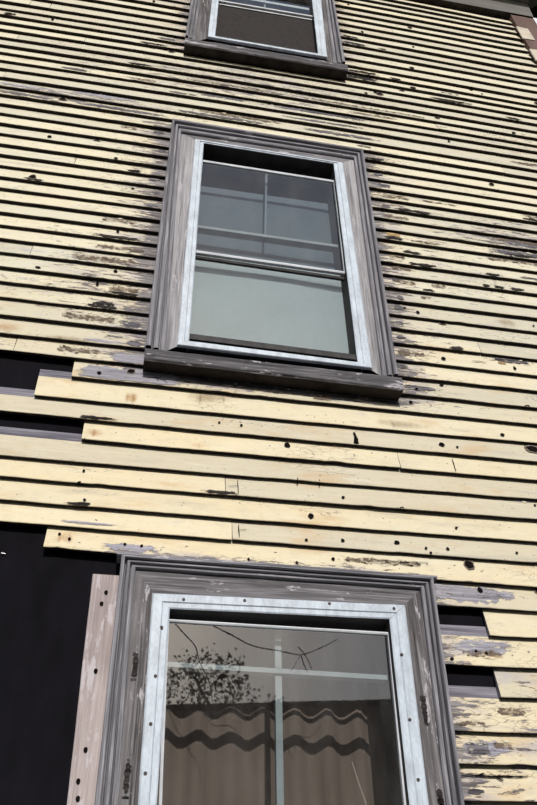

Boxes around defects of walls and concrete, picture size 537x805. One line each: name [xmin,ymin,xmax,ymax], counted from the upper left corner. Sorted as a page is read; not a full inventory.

peeling [0,81,57,101]
peeling [374,172,410,220]
peeling [72,244,144,265]
peeling [483,237,537,266]
peeling [387,253,415,285]
peeling [62,312,142,329]
peeling [57,338,145,356]
peeling [483,357,529,365]
peeling [449,639,515,659]
crack [461,773,528,781]